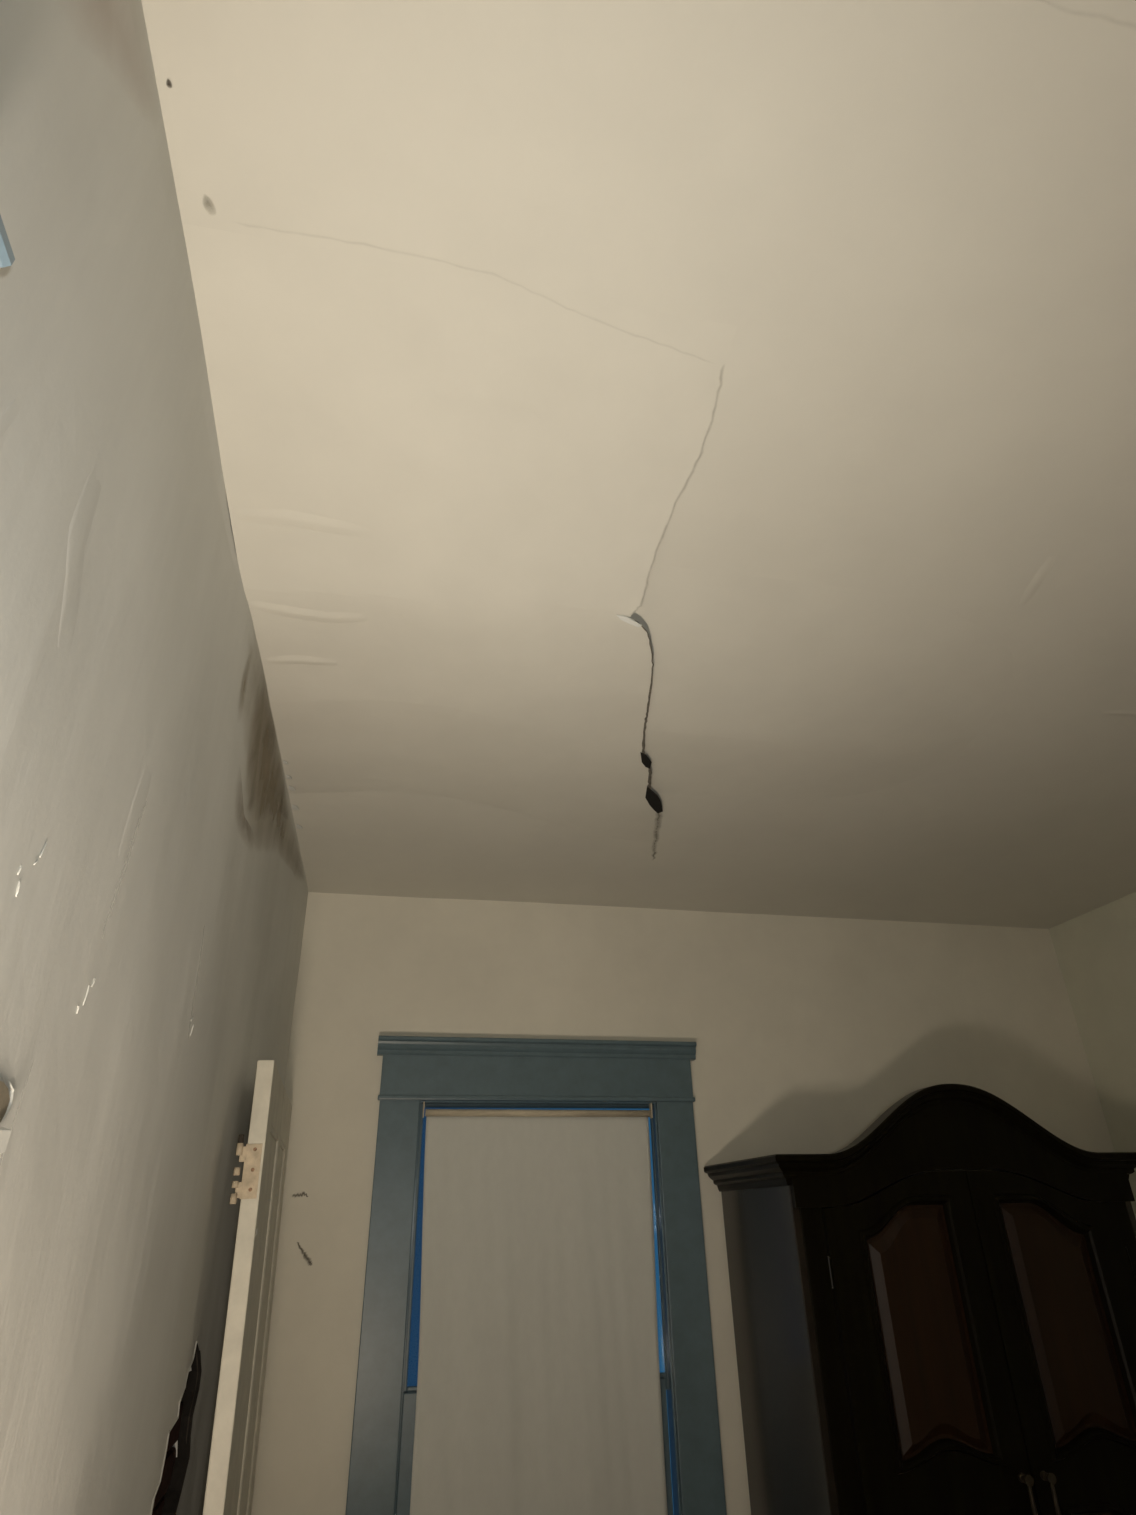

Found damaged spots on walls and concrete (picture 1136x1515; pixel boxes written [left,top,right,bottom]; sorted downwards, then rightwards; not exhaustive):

crack [617,615,663,857]
spalling [150,1341,202,1515]